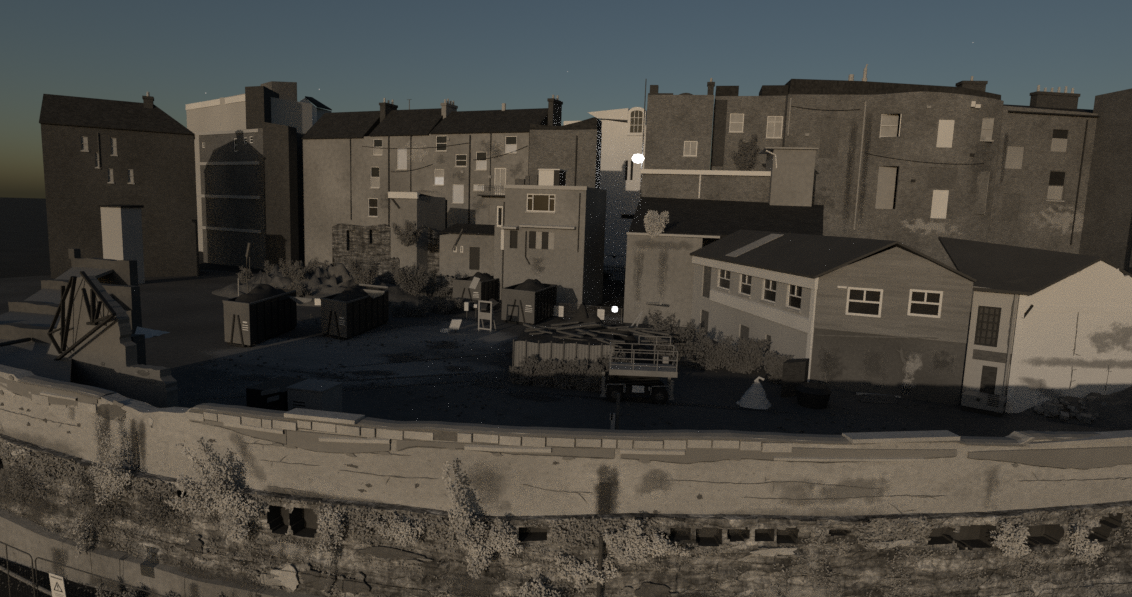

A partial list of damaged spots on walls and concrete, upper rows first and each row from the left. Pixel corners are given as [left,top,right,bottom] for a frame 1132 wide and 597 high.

water stain [131,421,145,460]
water stain [596,467,617,514]